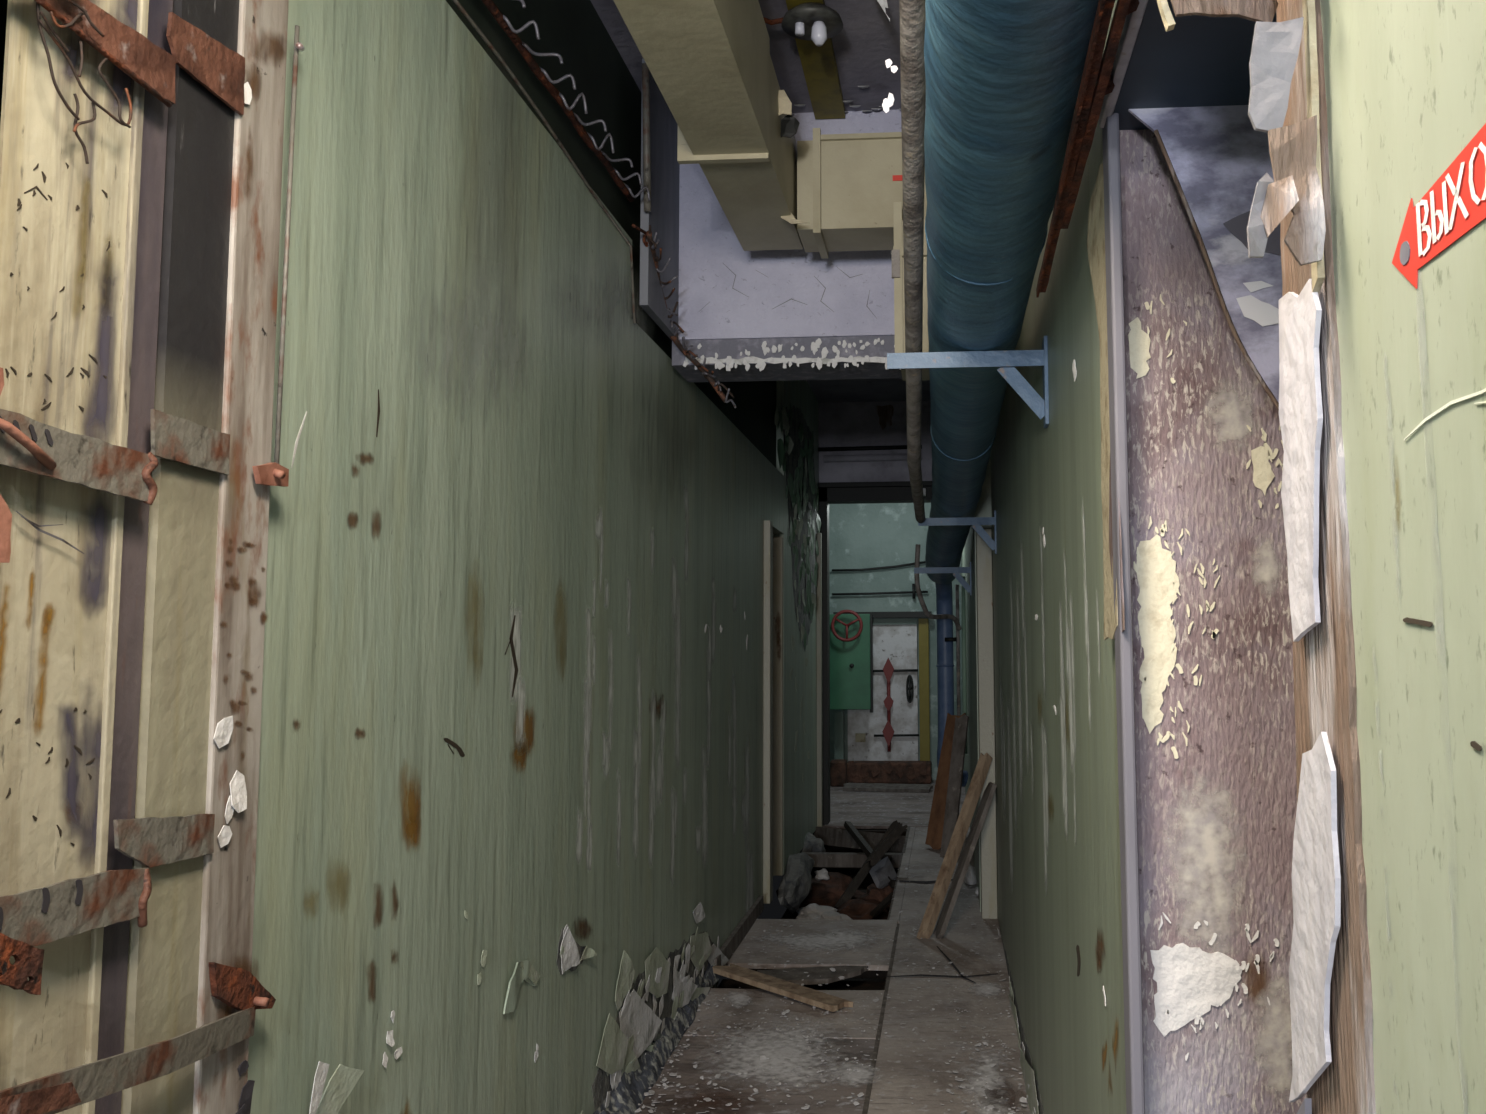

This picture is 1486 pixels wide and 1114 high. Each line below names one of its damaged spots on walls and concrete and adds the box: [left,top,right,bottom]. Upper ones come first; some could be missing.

peeling [683,338,901,371]
peeling [1128,294,1187,379]
peeling [1208,391,1284,509]
peeling [774,403,821,651]
peeling [1255,541,1278,589]
peeling [1133,516,1220,759]
rust [514,712,533,768]
rust [403,783,420,845]
peeling [556,925,598,975]
peeling [1150,791,1293,1091]
peeling [581,902,729,1114]